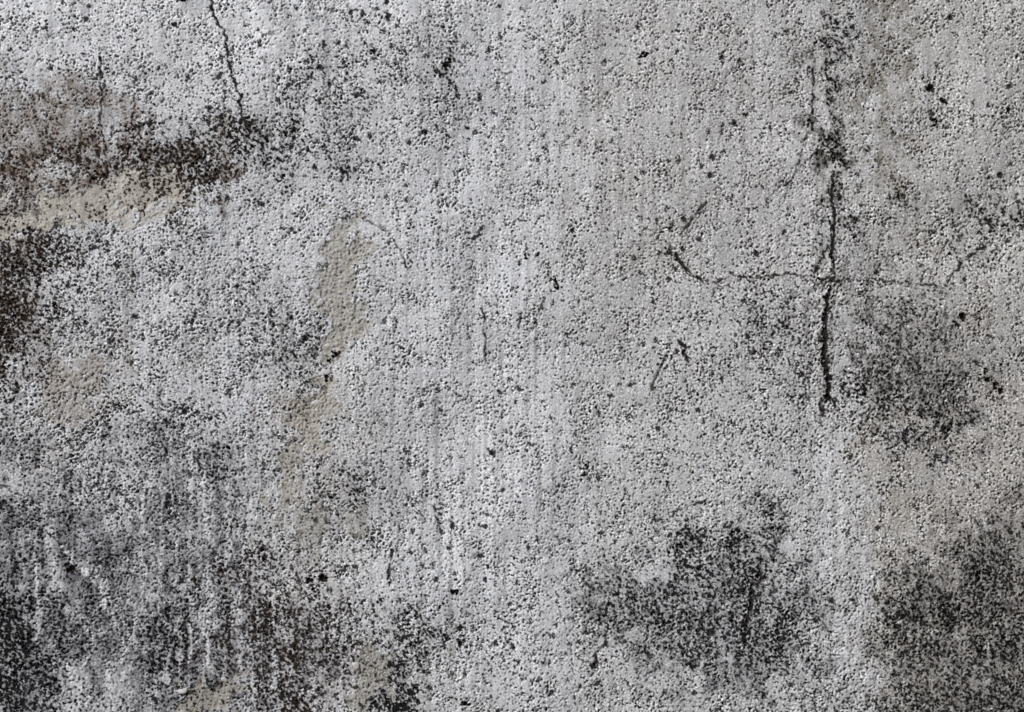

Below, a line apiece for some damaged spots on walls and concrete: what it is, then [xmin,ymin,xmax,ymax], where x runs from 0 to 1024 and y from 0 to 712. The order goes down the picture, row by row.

crack [210,0,251,128]
crack [765,39,817,205]
leakage [0,0,480,712]
crack [657,170,990,417]
leakage [544,460,1024,712]